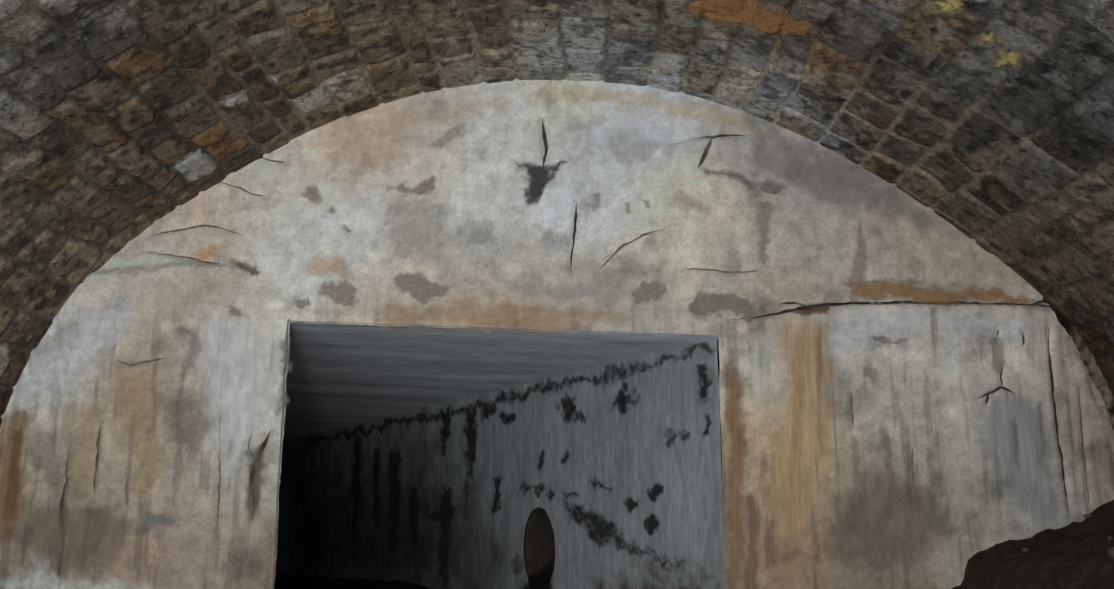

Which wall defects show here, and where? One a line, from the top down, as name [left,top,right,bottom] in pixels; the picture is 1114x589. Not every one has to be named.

crack [541,118,549,167]
crack [673,134,744,168]
crack [570,206,663,271]
rust [795,305,828,314]
crack [732,300,1090,519]
damp [292,343,712,589]